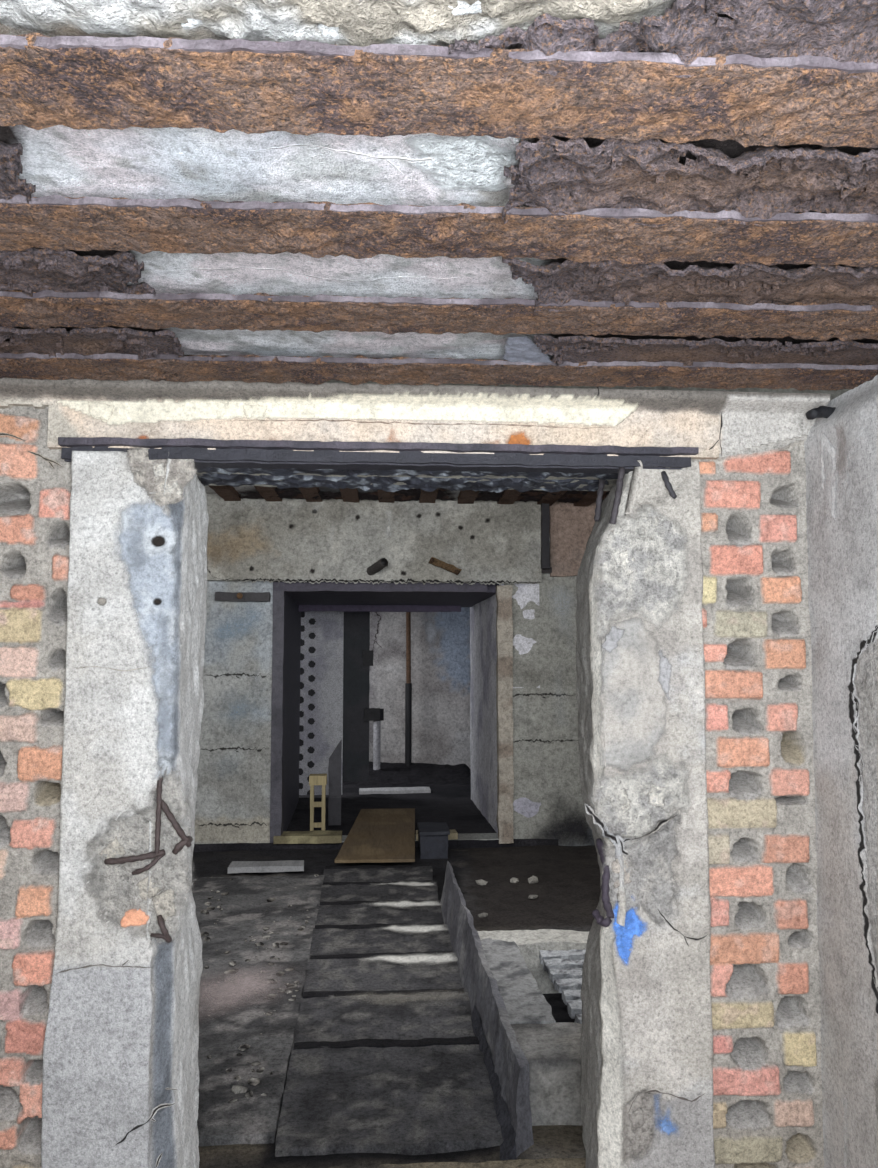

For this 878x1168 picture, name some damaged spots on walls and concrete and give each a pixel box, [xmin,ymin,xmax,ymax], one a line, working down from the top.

corrosion [0,141,36,205]
corrosion [502,137,878,228]
corrosion [0,247,156,297]
corrosion [502,257,878,312]
corrosion [0,326,184,360]
corrosion [534,334,878,370]
spalling [127,447,196,506]
spalling [592,467,691,927]
crack [845,624,878,1015]
spalling [87,771,193,943]